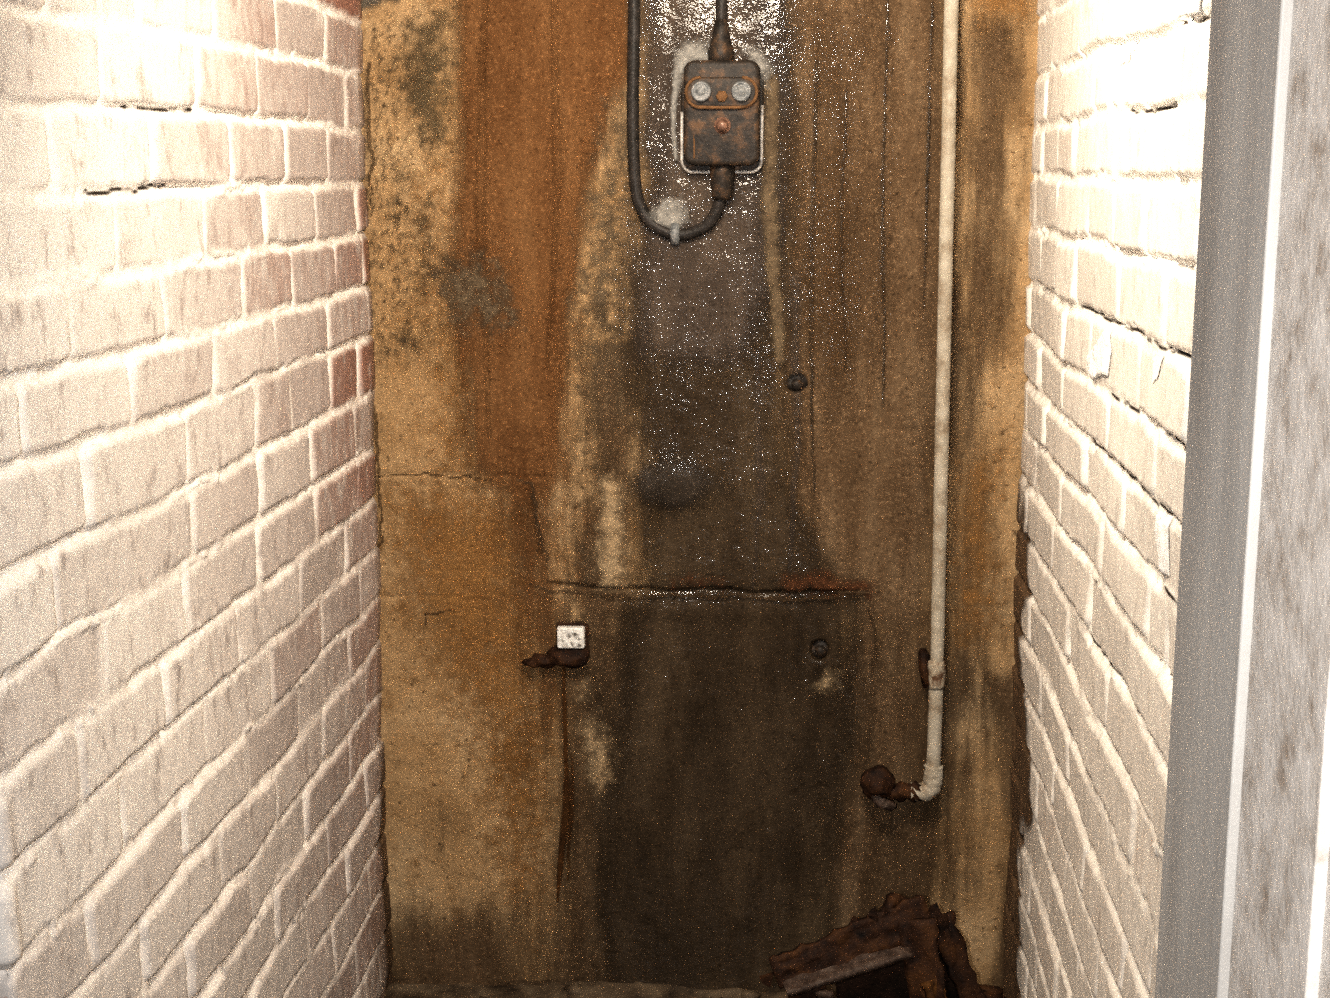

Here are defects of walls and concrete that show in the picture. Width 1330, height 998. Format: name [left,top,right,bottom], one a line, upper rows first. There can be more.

crack [1183,11,1211,24]
crack [120,104,192,112]
crack [1131,101,1178,113]
crack [365,63,376,216]
crack [85,183,165,195]
crack [1081,305,1192,357]
crack [1111,393,1140,412]
corrosion [391,0,628,902]
crack [371,377,876,672]
damp [364,0,1033,998]
crack [1093,439,1182,524]